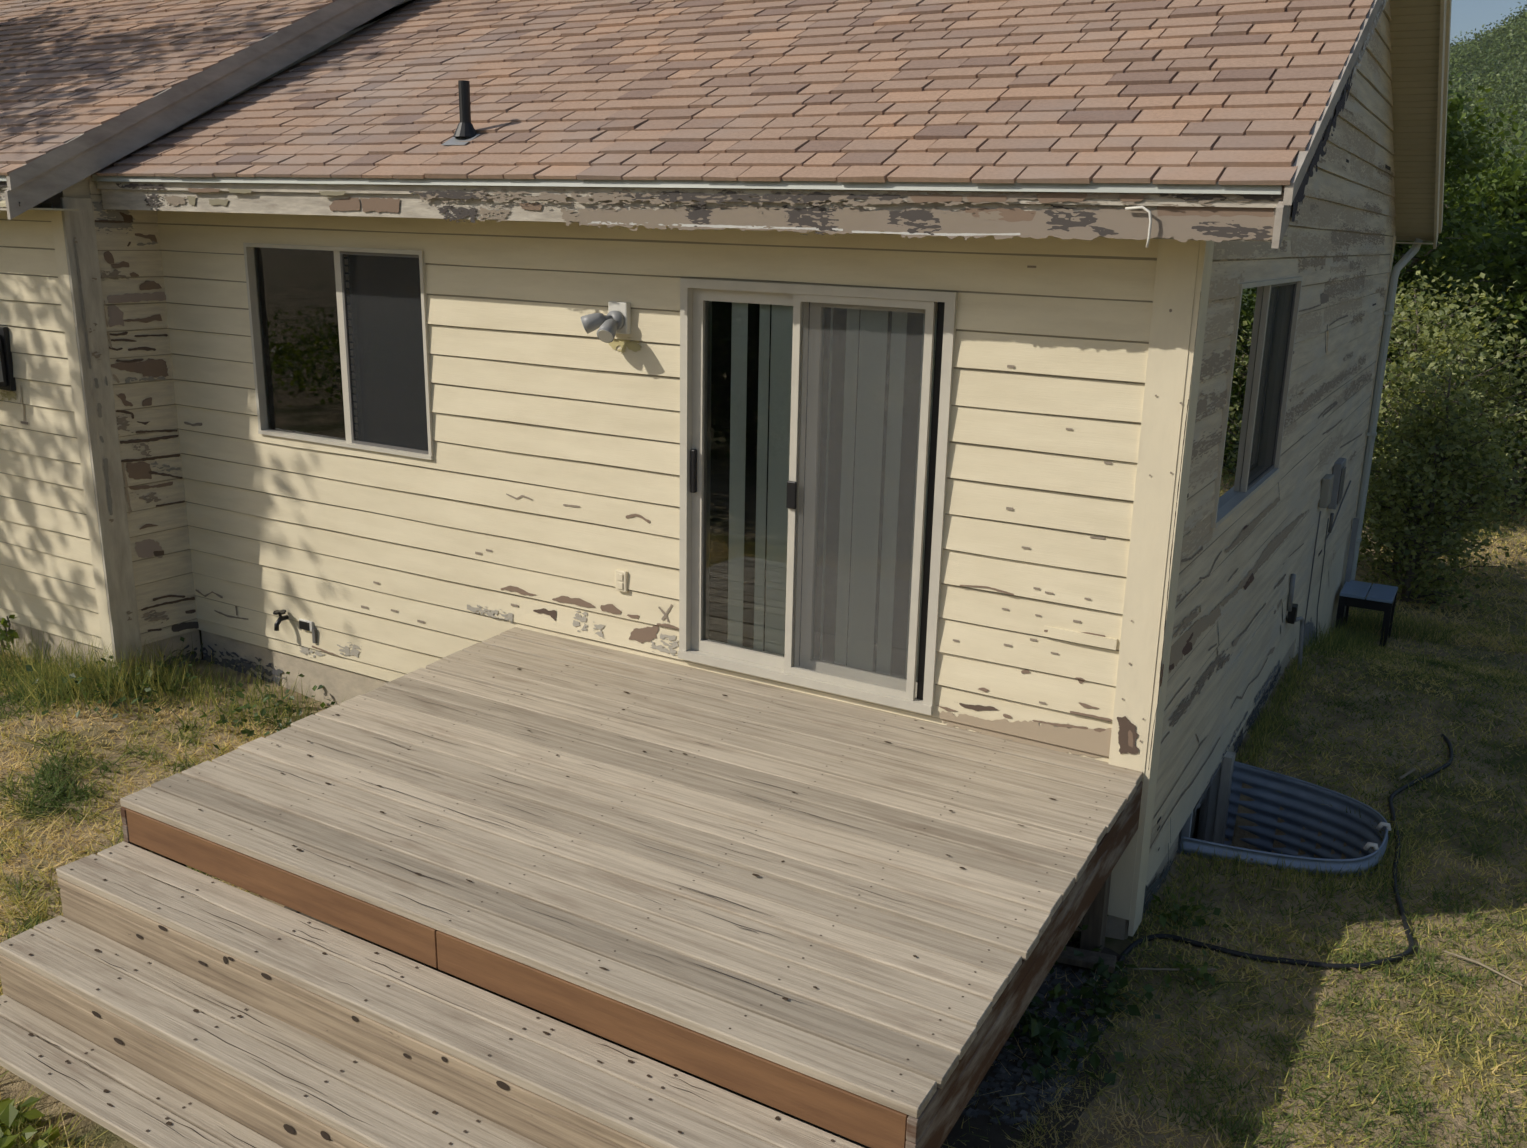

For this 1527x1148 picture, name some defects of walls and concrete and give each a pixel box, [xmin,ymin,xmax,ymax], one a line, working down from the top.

peeling [319,188,1284,242]
peeling [92,200,166,327]
peeling [73,237,169,418]
peeling [100,436,181,515]
peeling [300,642,362,660]
peeling [467,604,514,624]
peeling [501,586,679,656]
peeling [1169,510,1309,673]
peeling [937,688,1133,758]